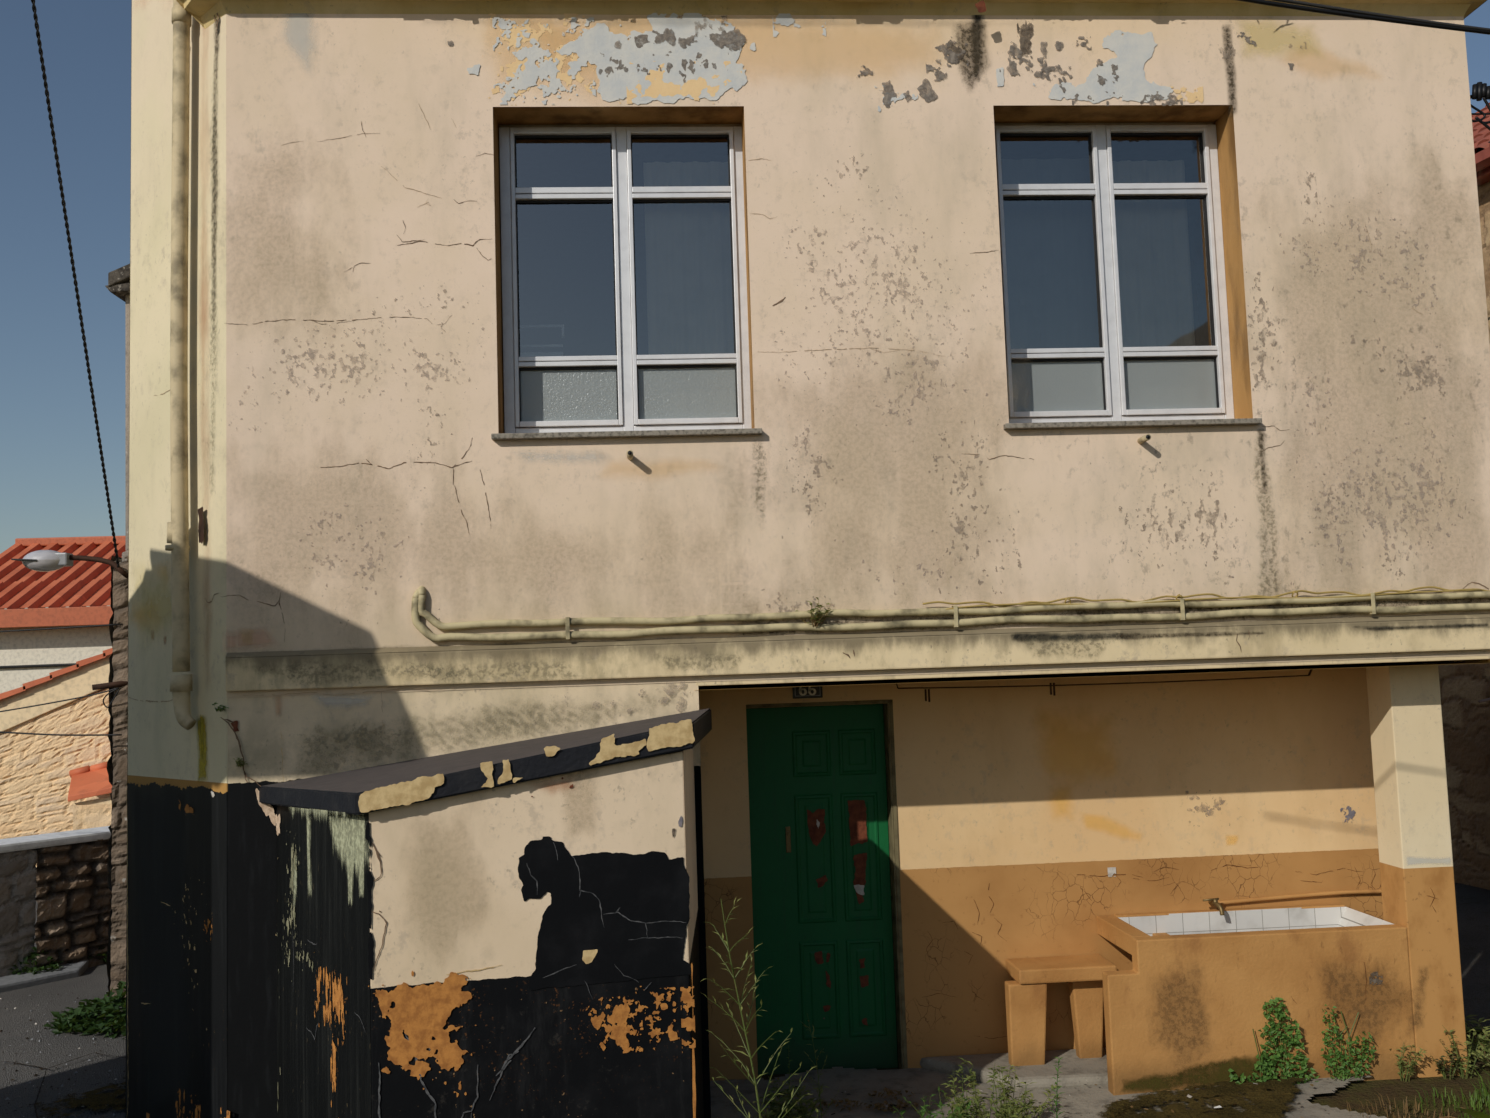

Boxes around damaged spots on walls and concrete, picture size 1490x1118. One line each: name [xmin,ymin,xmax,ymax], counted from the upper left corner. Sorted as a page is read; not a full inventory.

peeling [488,13,756,106]
flaking render [857,37,970,112]
peeling [996,18,1204,106]
crack [320,440,491,535]
peeling [480,759,521,788]
peeling [589,719,695,765]
damp [293,818,311,892]
damp [329,812,366,903]
crack [1078,864,1255,901]
peeling [255,788,344,1090]
peeling [358,774,476,1097]
peeling [586,963,696,1118]